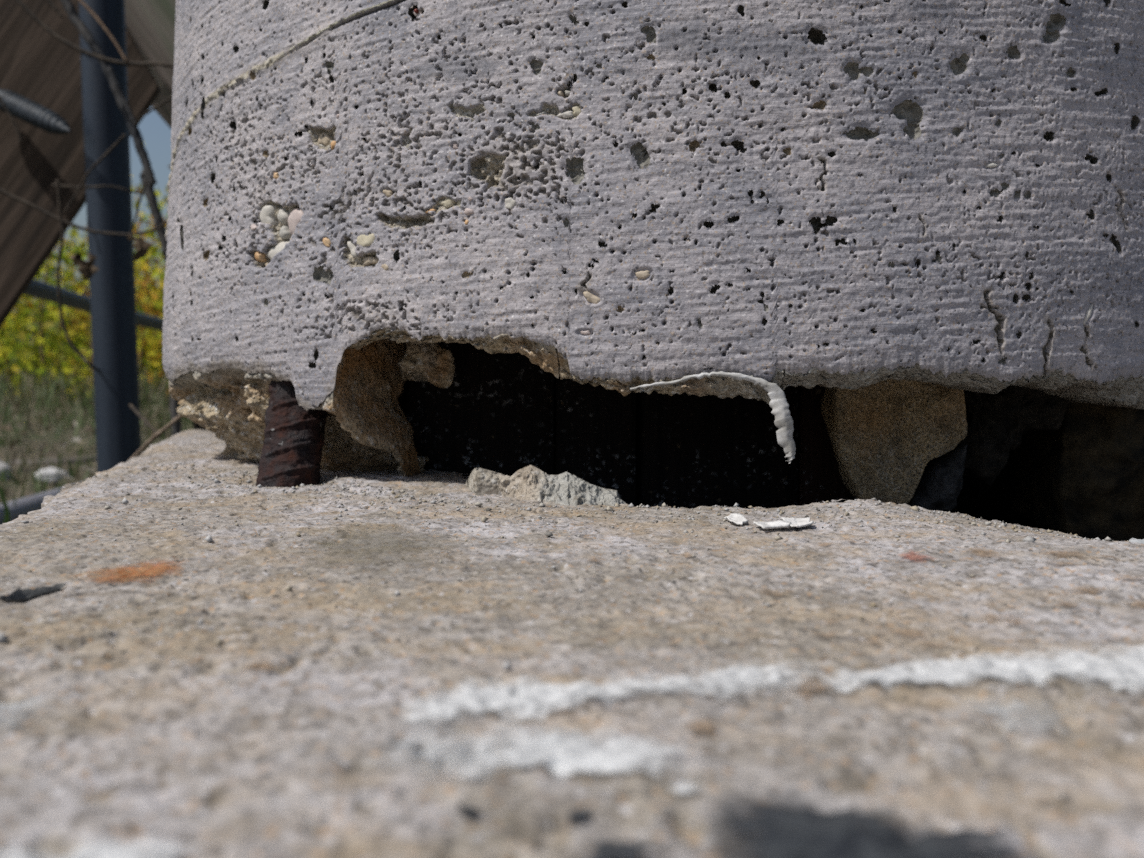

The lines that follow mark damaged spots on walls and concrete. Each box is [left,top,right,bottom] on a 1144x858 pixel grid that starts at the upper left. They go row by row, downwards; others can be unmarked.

spalling [169,368,283,463]
spalling [310,327,1144,477]
peeling [724,513,748,525]
peeling [781,517,814,528]